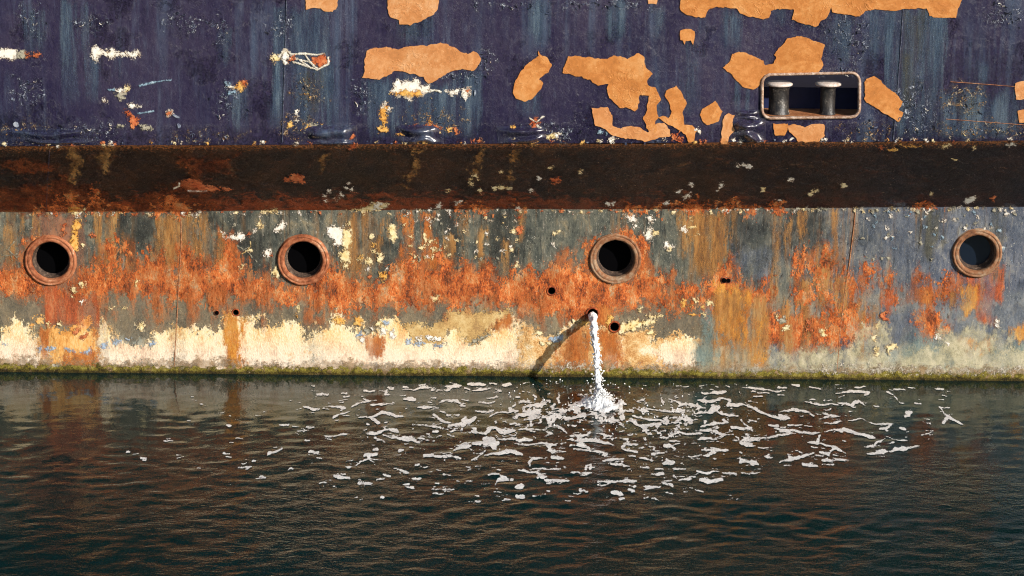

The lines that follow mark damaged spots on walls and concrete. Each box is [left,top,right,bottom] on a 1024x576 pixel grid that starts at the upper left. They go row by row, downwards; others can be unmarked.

peeling [89,44,140,62]
peeling [264,11,331,141]
peeling [351,46,499,134]
peeling [837,74,1024,141]
corrosion [0,147,1005,371]
corrosion [1014,326,1024,345]